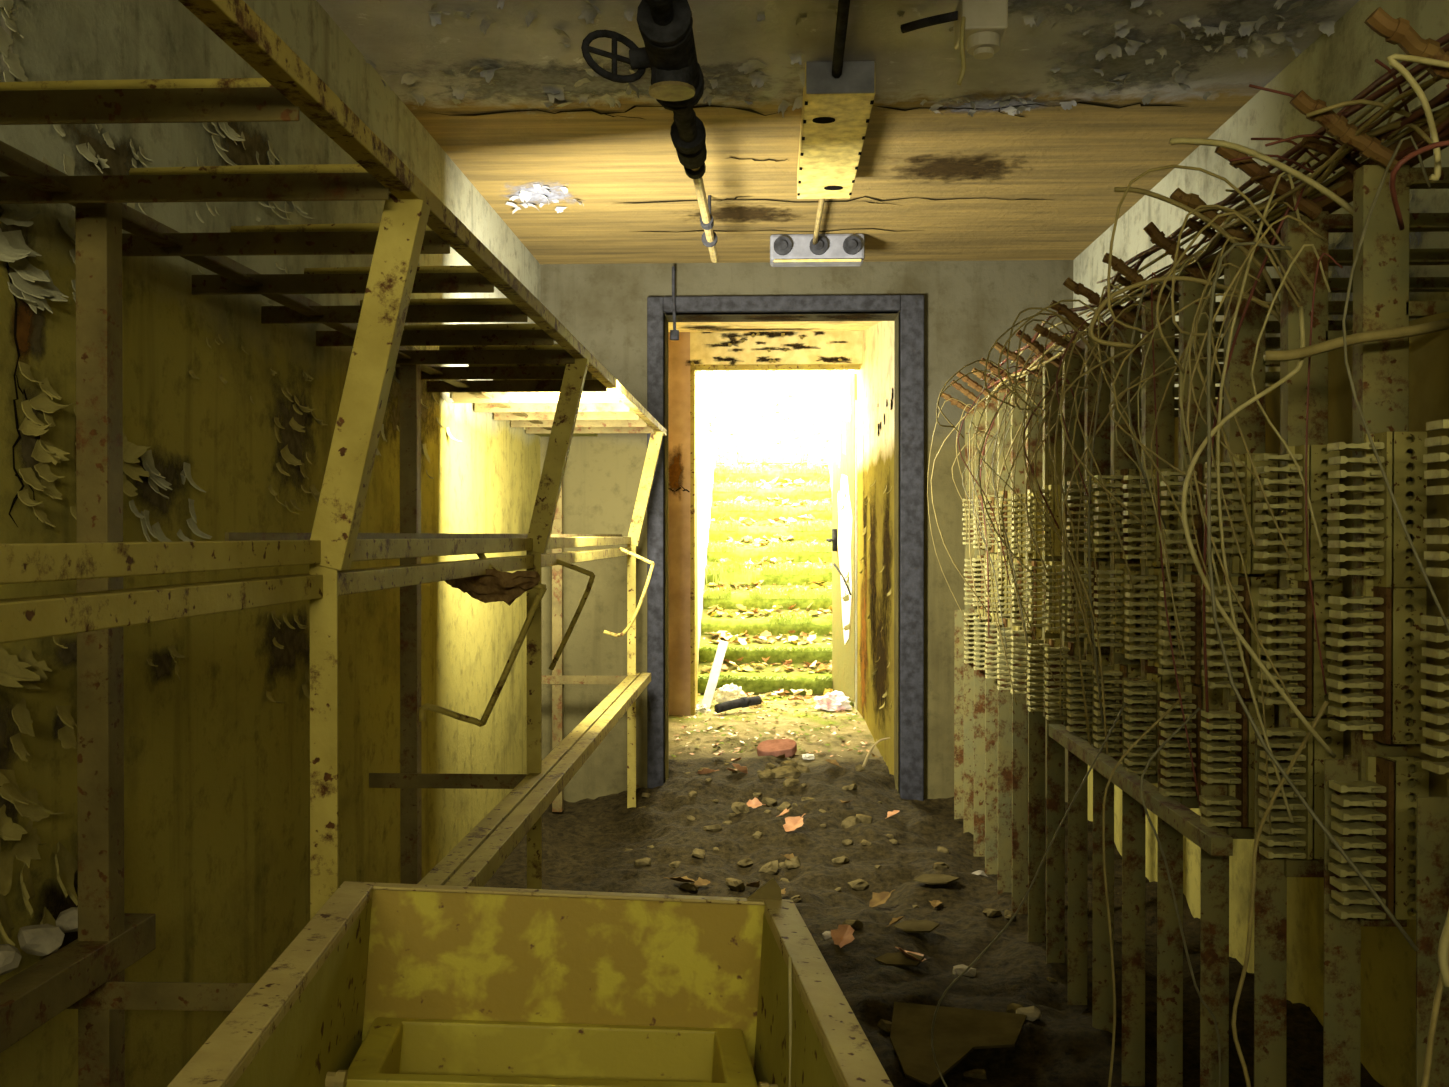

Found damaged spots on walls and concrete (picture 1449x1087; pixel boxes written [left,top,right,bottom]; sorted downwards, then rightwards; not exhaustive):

peeling [0,204,76,314]
peeling [684,314,876,365]
peeling [17,361,76,527]